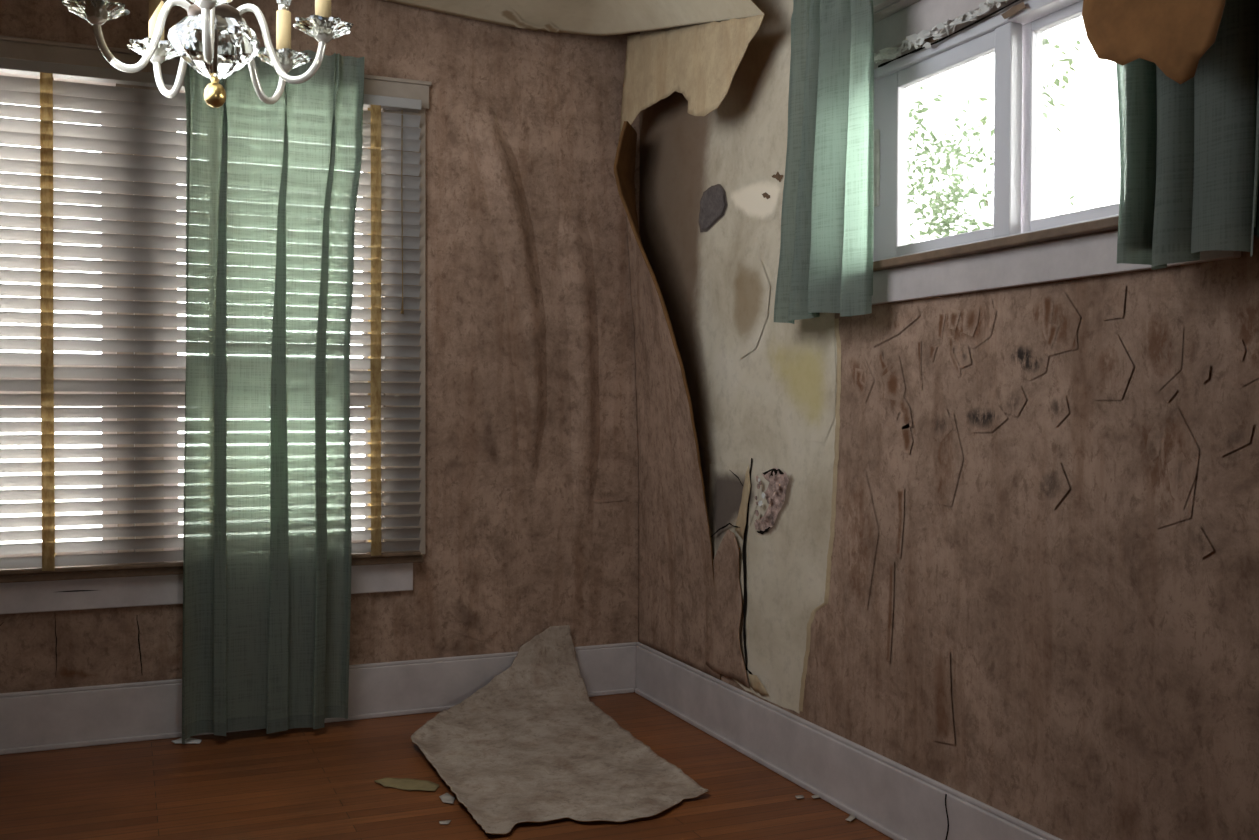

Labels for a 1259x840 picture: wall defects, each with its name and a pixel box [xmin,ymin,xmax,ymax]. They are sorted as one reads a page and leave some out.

peeling [874,0,1026,68]
leakage [639,91,722,519]
flaking render [616,0,841,713]
leakage [728,250,836,443]
leakage [926,338,1049,442]
crack [711,458,769,695]